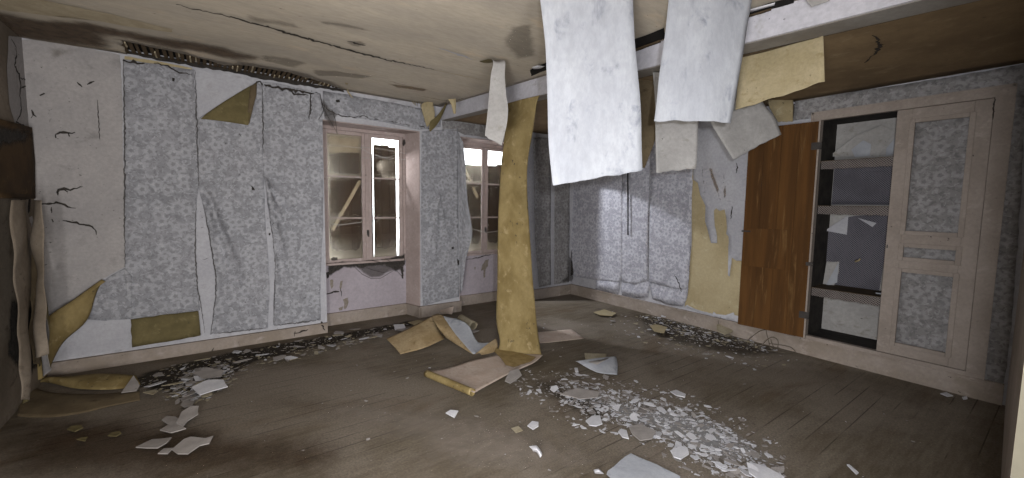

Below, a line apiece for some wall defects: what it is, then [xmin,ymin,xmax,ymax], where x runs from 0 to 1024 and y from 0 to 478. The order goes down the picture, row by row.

crack [176,4,484,101]
crack [743,0,981,63]
crack [42,201,71,222]
peeling [7,36,348,380]
flaking render [685,174,741,316]